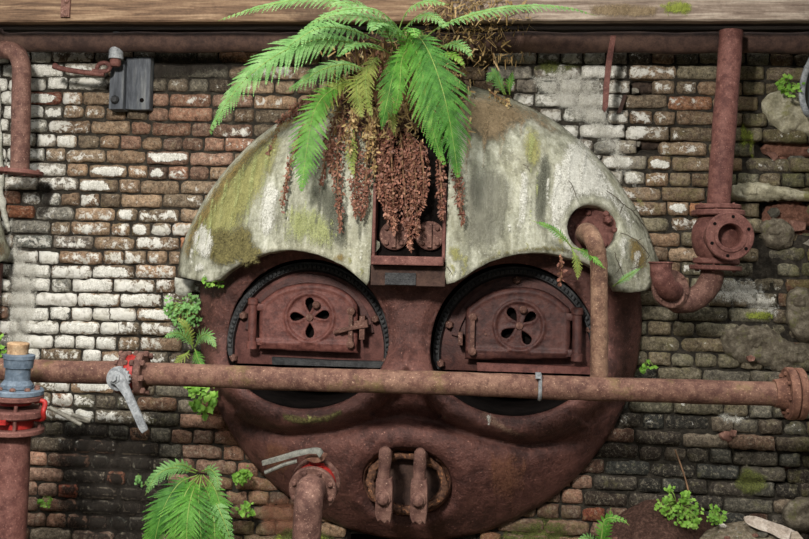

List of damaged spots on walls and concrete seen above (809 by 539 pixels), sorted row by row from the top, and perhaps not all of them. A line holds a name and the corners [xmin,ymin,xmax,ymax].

leakage [0,89,36,342]